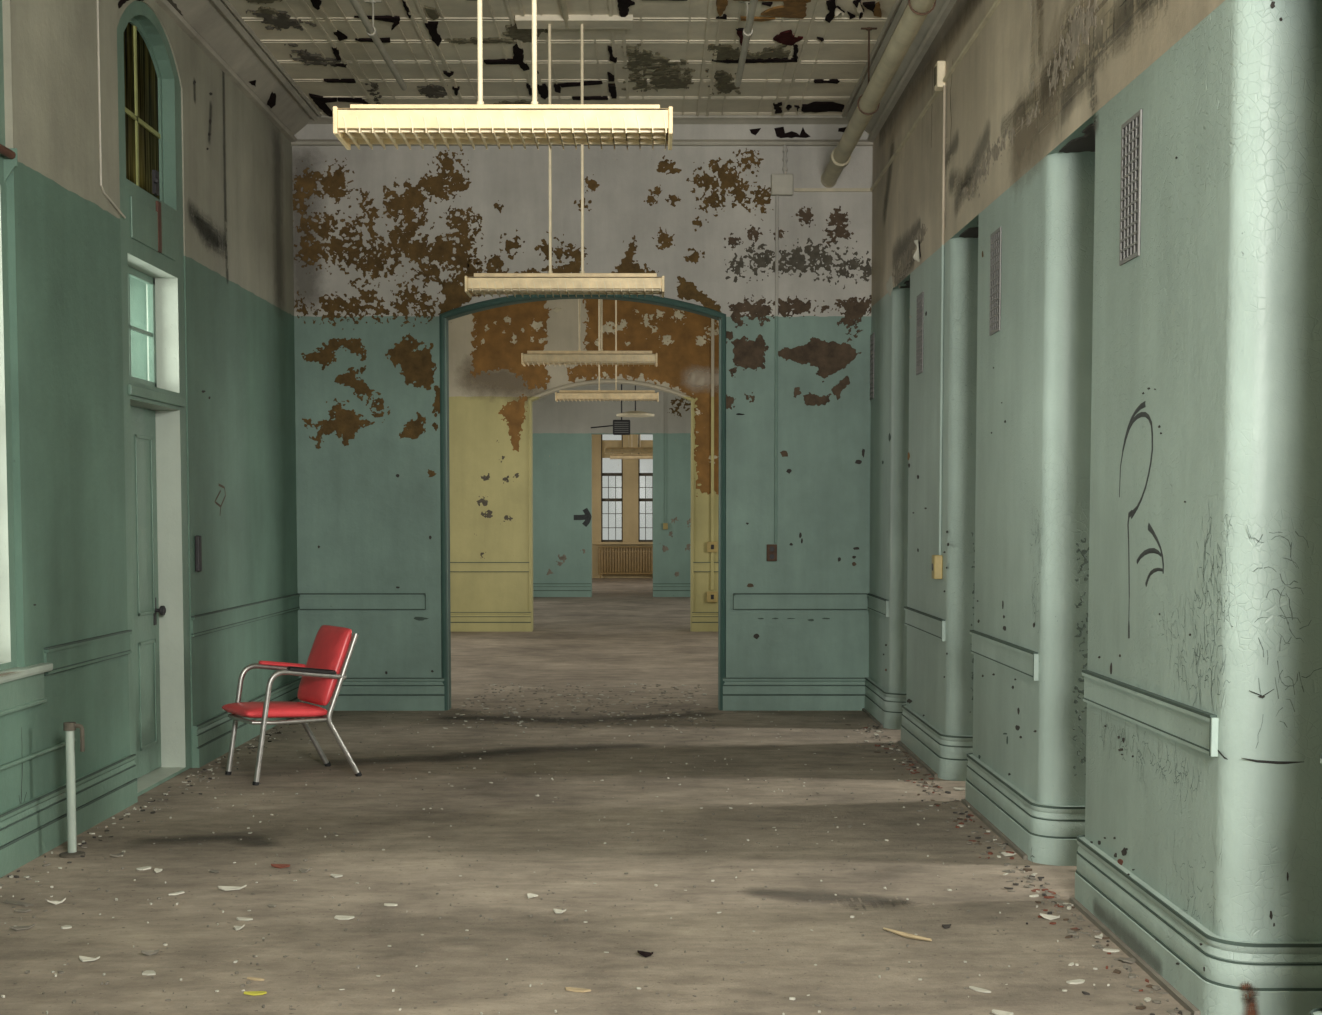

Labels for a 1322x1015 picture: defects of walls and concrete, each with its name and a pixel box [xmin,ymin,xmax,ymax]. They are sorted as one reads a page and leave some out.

peeling [246,0,882,117]
water stain [1014,0,1108,167]
peeling [292,101,872,497]
peeling [476,496,513,522]